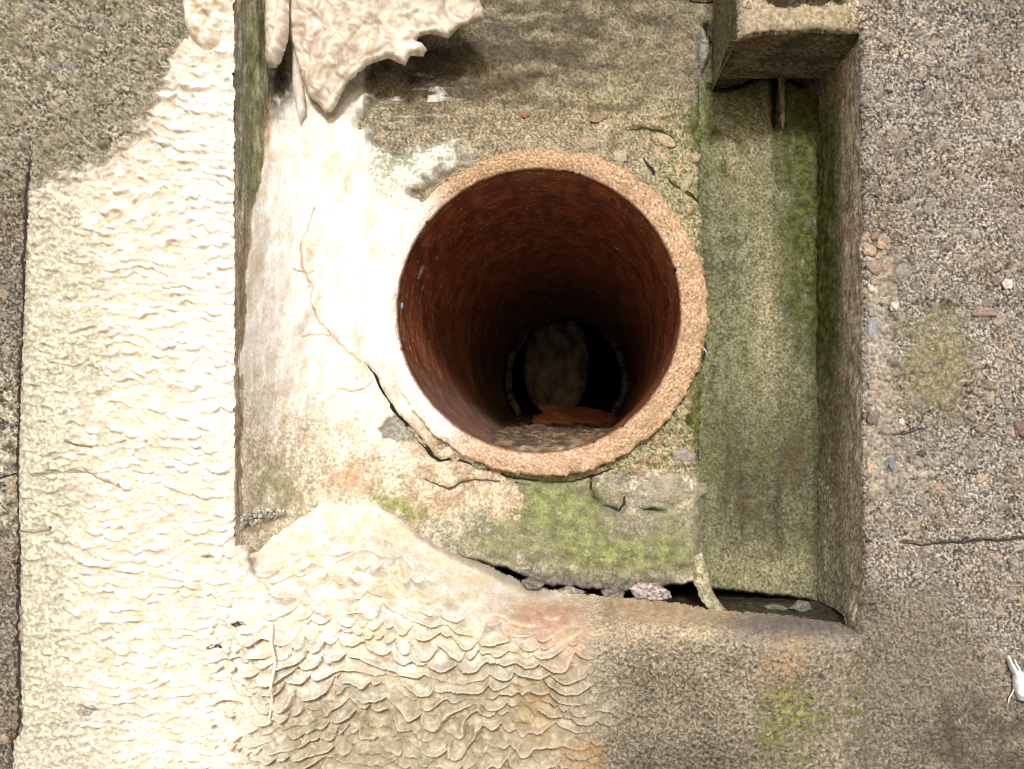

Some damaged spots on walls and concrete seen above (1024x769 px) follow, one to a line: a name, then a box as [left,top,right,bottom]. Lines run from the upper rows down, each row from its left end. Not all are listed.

crack [293,207,663,512]